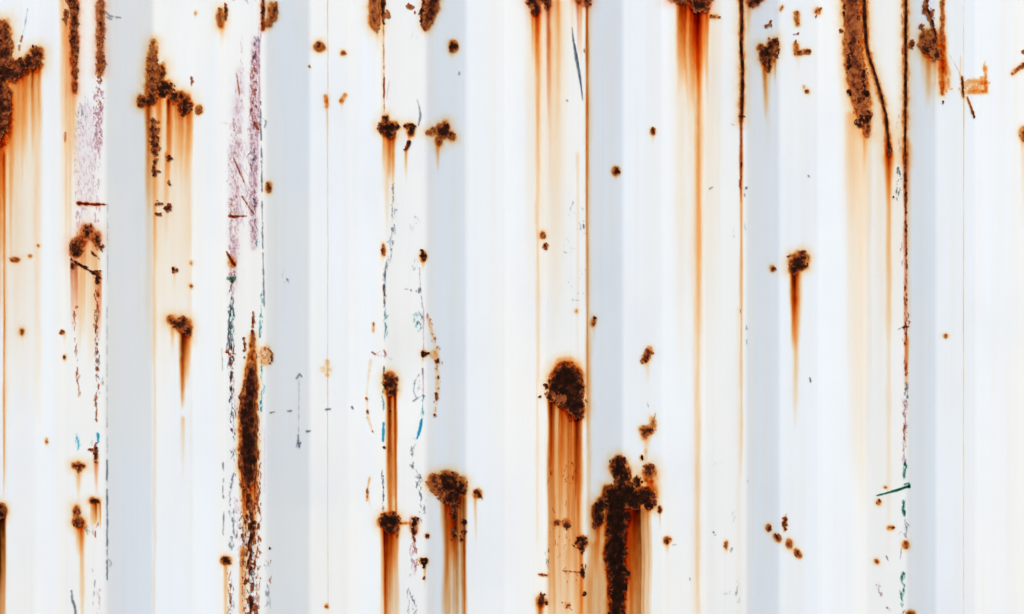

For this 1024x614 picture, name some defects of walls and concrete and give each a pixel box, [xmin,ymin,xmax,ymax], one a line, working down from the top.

corrosion [0,20,44,190]
corrosion [137,39,202,186]
corrosion [377,115,456,151]
corrosion [757,6,811,75]
corrosion [839,0,873,138]
corrosion [69,223,104,284]
corrosion [771,250,810,311]
corrosion [237,311,273,504]
corrosion [383,372,398,478]
corrosion [538,361,587,475]
corrosion [425,470,483,583]
corrosion [554,455,662,614]